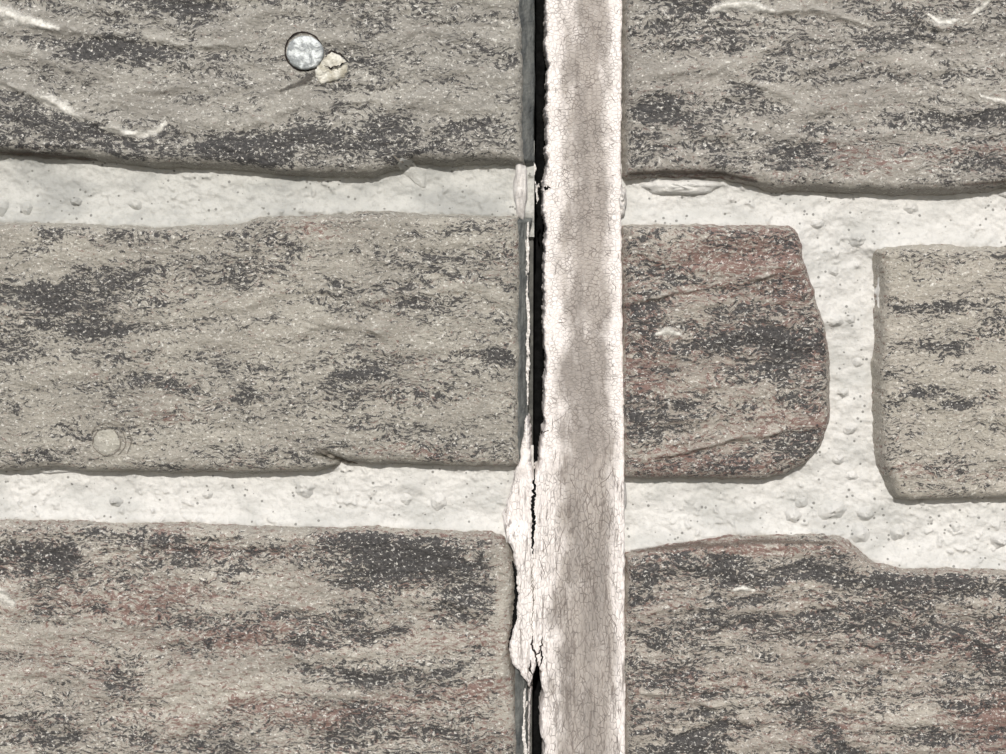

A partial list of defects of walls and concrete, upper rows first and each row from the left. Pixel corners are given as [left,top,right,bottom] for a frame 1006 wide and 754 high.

crack [508,0,622,754]